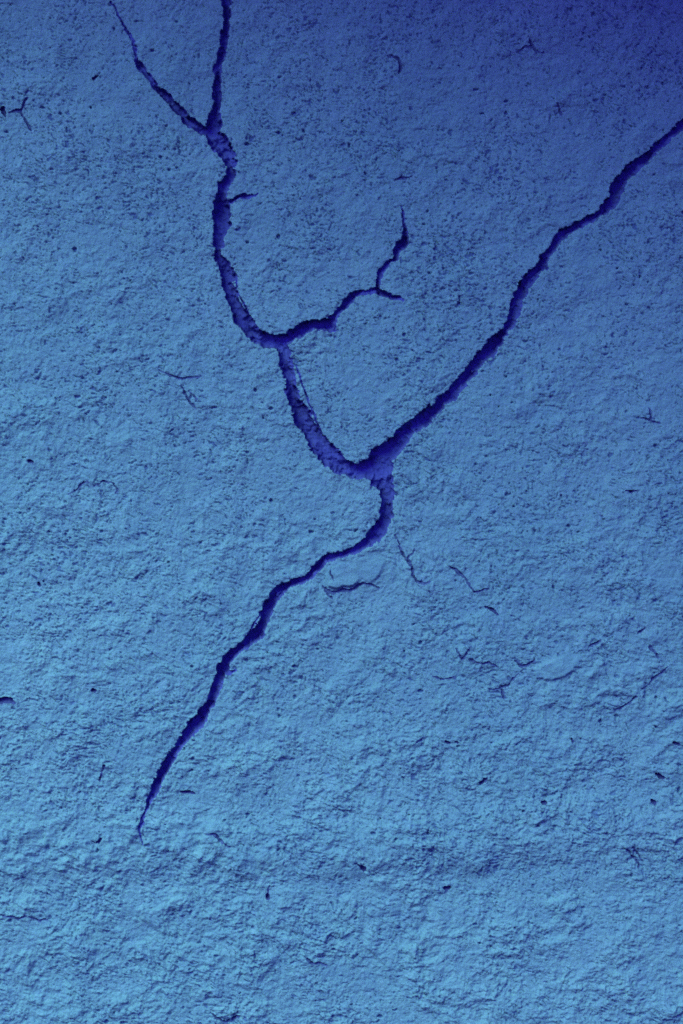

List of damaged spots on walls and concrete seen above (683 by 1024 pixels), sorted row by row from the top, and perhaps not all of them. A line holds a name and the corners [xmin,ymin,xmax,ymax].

crack [109,0,683,845]